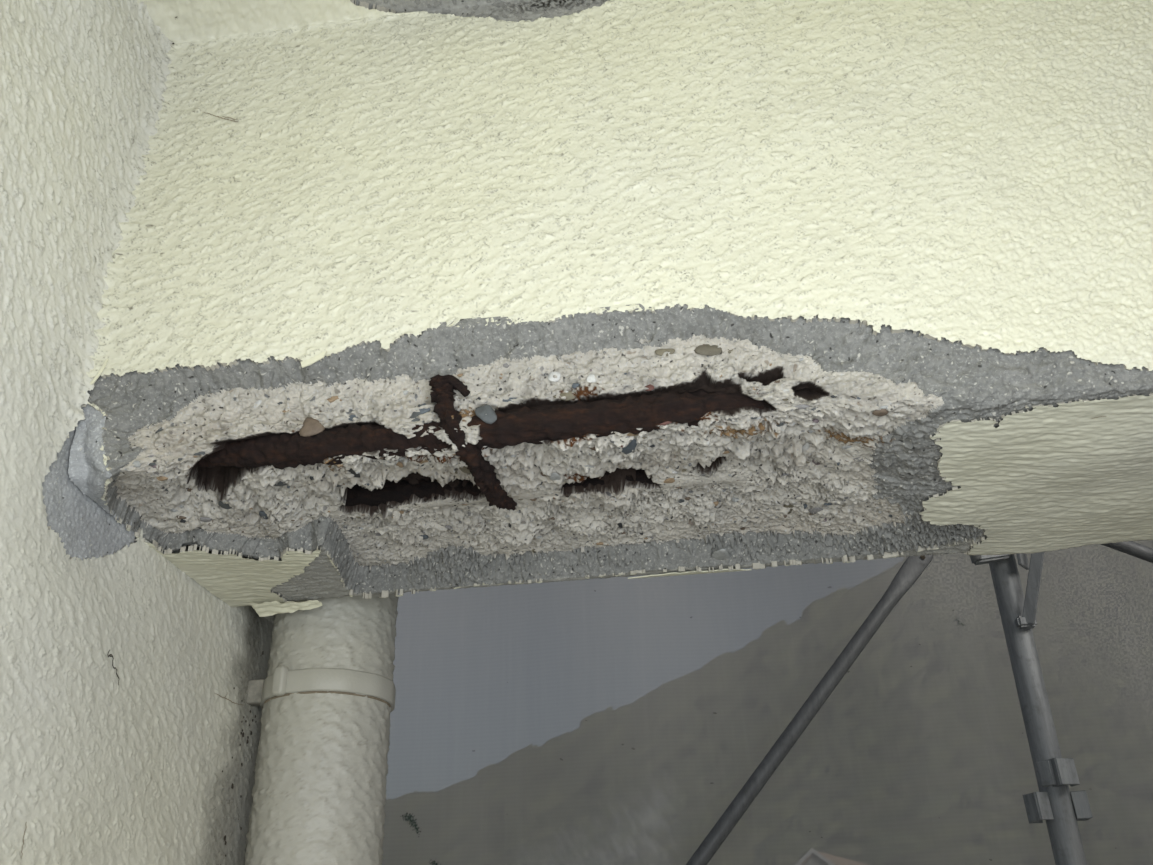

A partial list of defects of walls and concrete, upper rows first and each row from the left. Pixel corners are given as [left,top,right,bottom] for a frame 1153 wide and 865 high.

peeling [354,0,610,22]
spalling [42,304,1153,617]